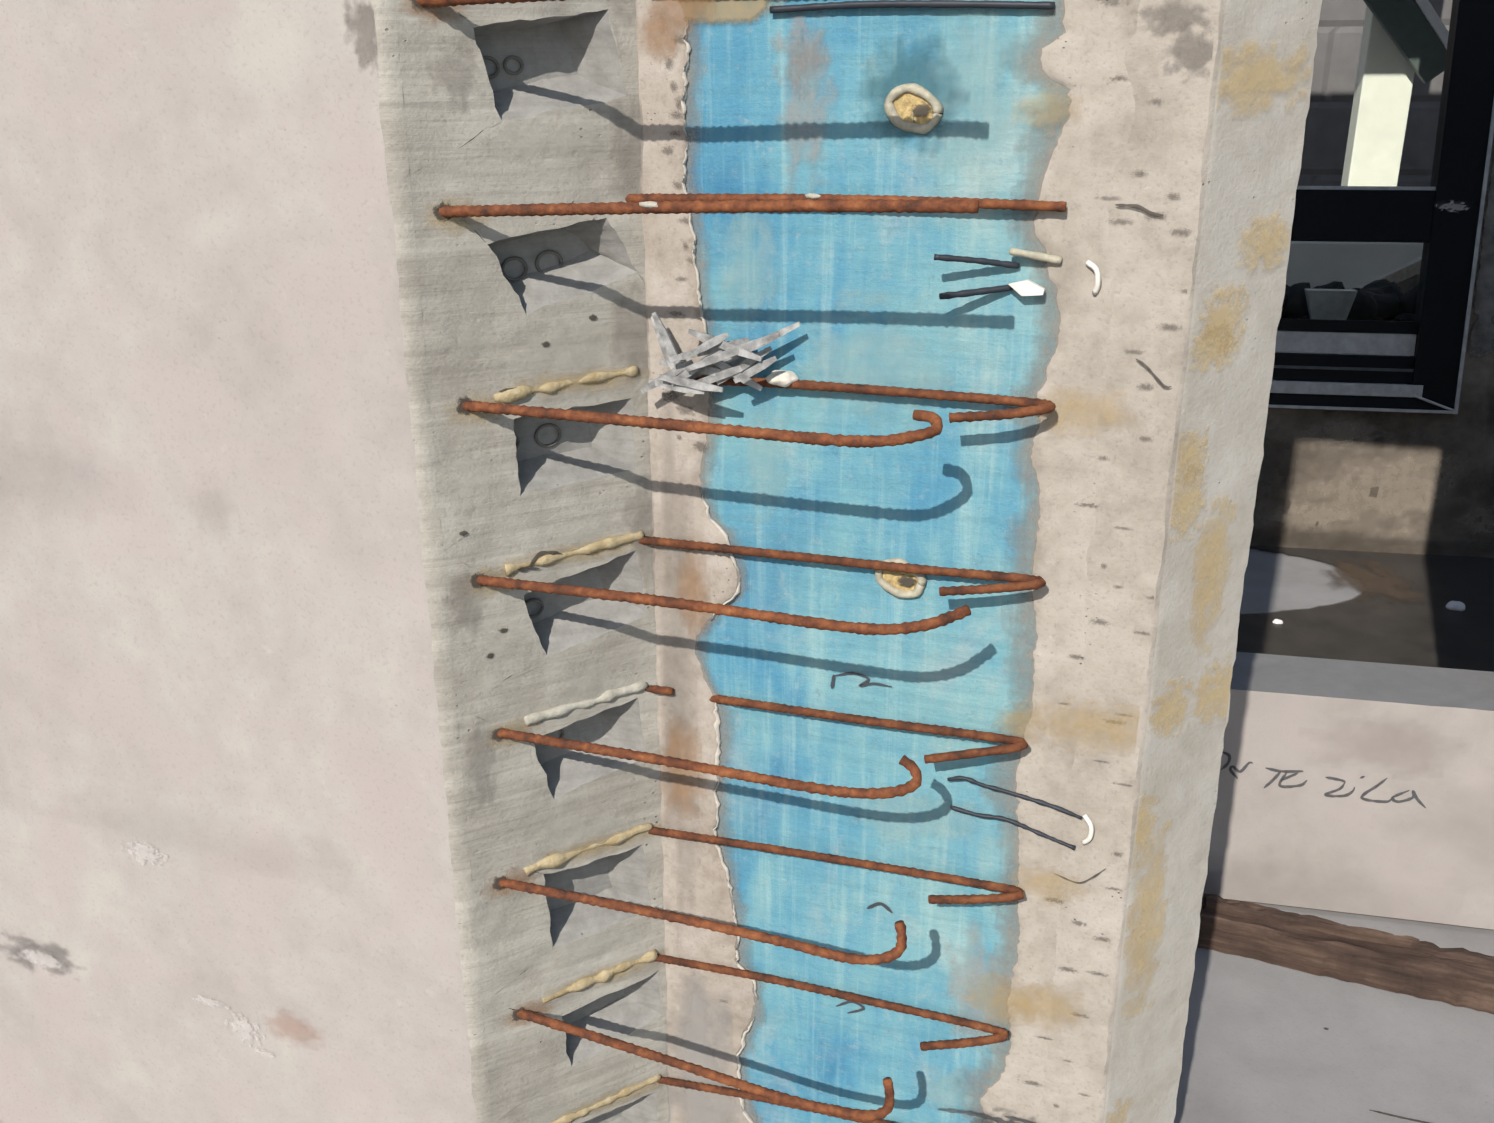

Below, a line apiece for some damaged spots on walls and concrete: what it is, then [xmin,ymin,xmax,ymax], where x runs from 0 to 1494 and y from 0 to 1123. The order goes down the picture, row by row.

water stain [1023,0,1072,398]
peeling [411,0,1213,1123]
water stain [1300,422,1381,444]
water stain [1236,456,1494,672]
spalling [24,950,60,968]
water stain [937,416,1041,1123]